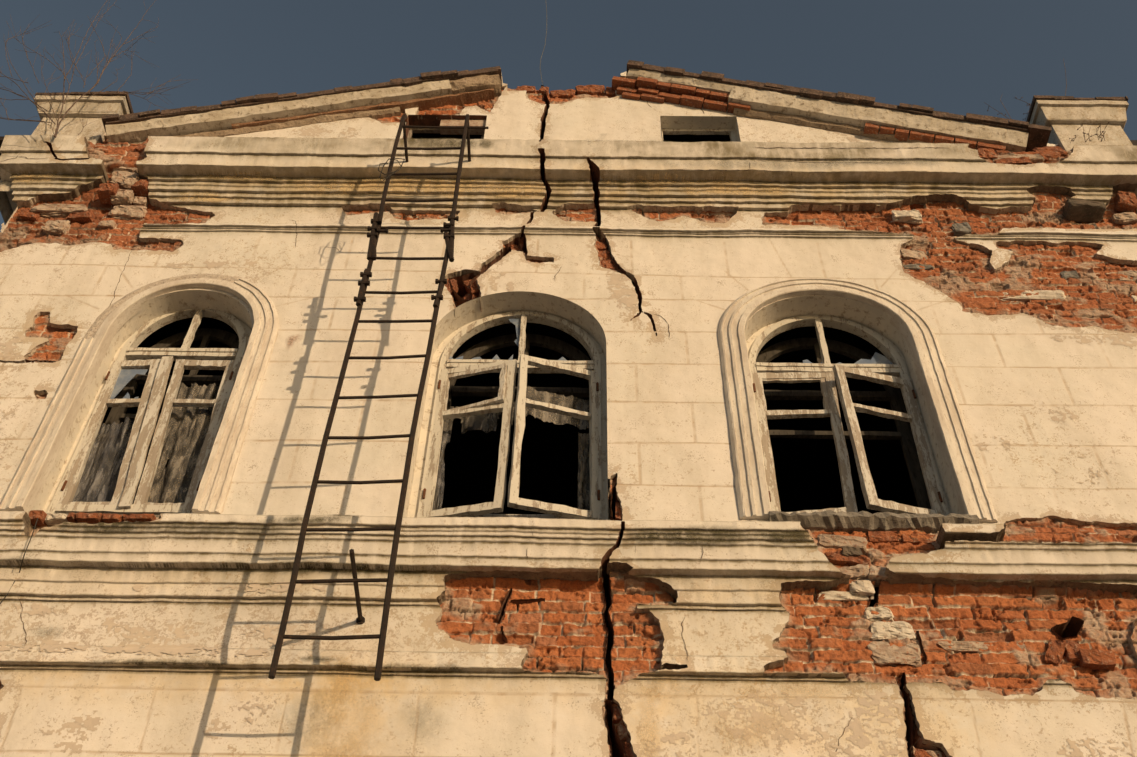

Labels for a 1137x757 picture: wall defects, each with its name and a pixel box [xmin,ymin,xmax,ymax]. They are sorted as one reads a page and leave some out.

flaking render [377,73,751,123]
flaking render [0,135,270,283]
crack [449,85,552,305]
crack [587,157,670,336]
flaking render [762,183,1137,349]
flaking render [0,312,78,429]
peeling [0,613,333,657]
flaking render [435,562,688,702]
crack [601,477,637,757]
crack [868,579,881,612]
flaking render [644,515,1137,757]
crack [899,631,927,757]